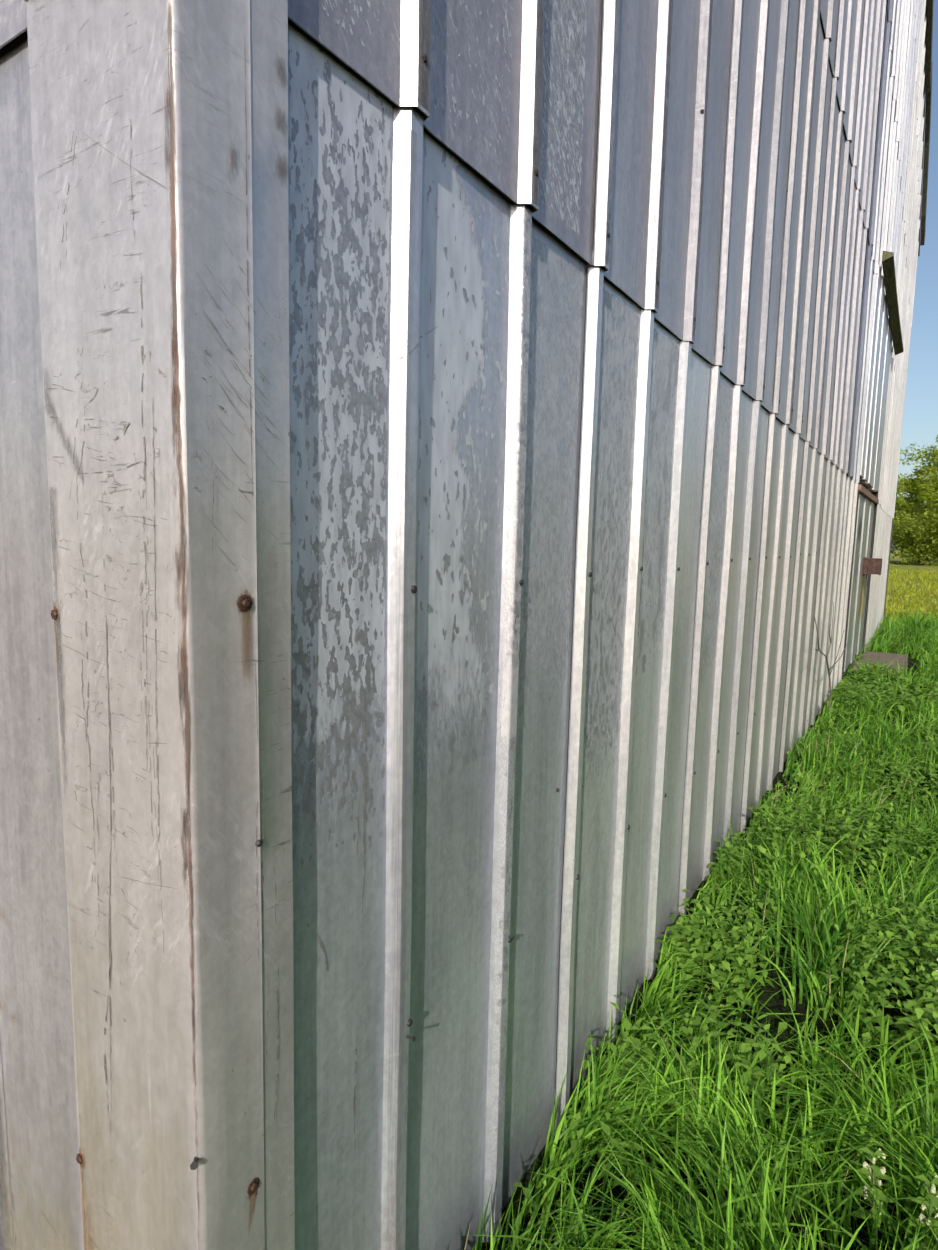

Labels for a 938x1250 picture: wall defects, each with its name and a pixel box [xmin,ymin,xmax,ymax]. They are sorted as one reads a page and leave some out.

rust [237,591,253,667]
peeling [288,25,392,873]